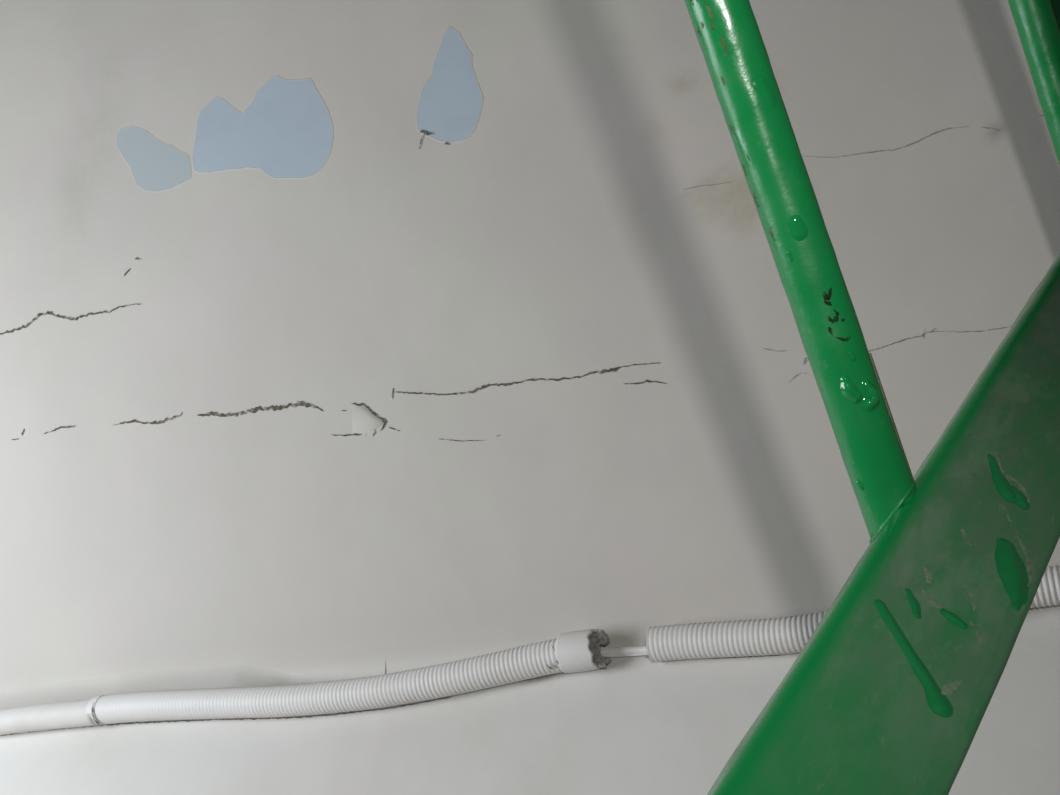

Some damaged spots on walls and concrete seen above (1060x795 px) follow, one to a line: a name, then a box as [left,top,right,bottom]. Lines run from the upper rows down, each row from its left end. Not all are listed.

peeling [416,25,484,149]
peeling [116,75,334,192]
crack [811,126,999,158]
crack [0,303,140,335]
crack [868,327,1006,352]
crack [120,362,667,436]
crack [12,425,75,440]